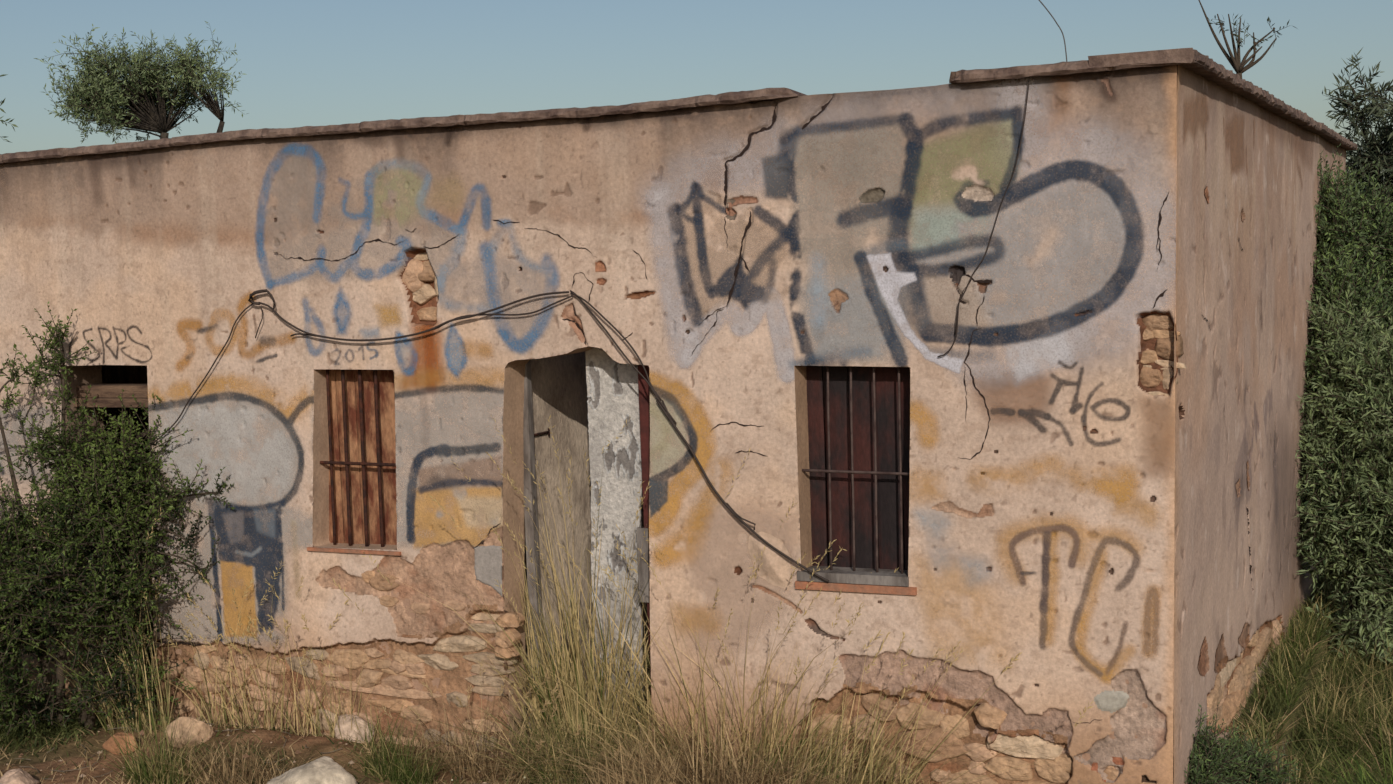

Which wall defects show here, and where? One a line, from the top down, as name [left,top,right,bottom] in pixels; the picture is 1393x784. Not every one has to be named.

flaking render [400,249,439,325]
crack [691,97,833,356]
crack [956,274,991,460]
flaking render [1137,311,1187,419]
flaking render [154,527,526,759]
flaking render [734,566,1167,784]
flaking render [1197,615,1285,735]